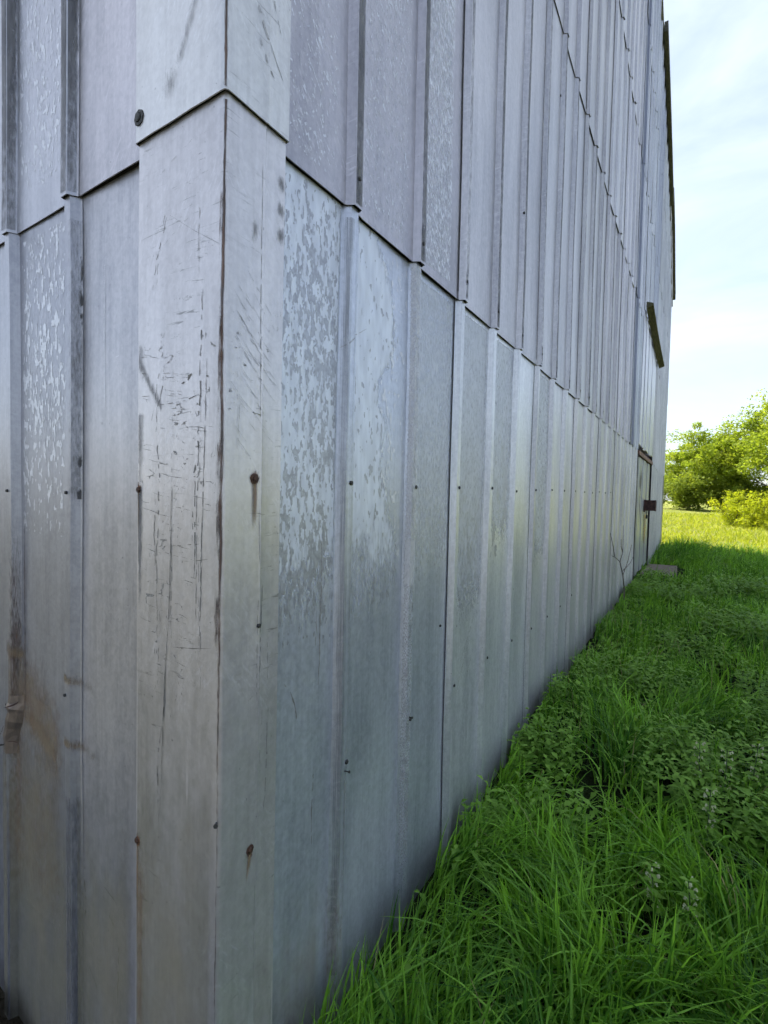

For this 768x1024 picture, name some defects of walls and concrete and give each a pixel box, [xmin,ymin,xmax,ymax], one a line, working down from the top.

peeling [22,222,65,537]
corrosion [250,471,258,515]
peeling [278,160,341,649]